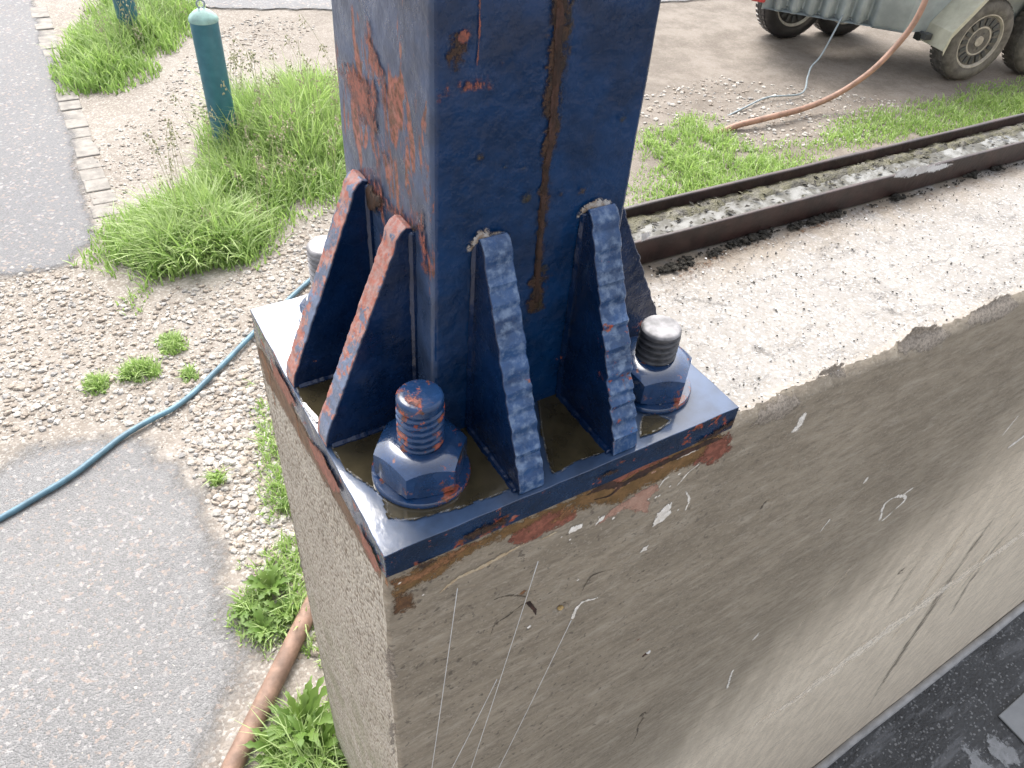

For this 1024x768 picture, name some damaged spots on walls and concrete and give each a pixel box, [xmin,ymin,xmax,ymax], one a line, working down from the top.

rust [446,29,471,74]
rust [526,0,574,314]
spalling [965,294,1019,325]
spalling [898,323,951,355]
spalling [812,362,845,379]
rust [257,347,735,598]